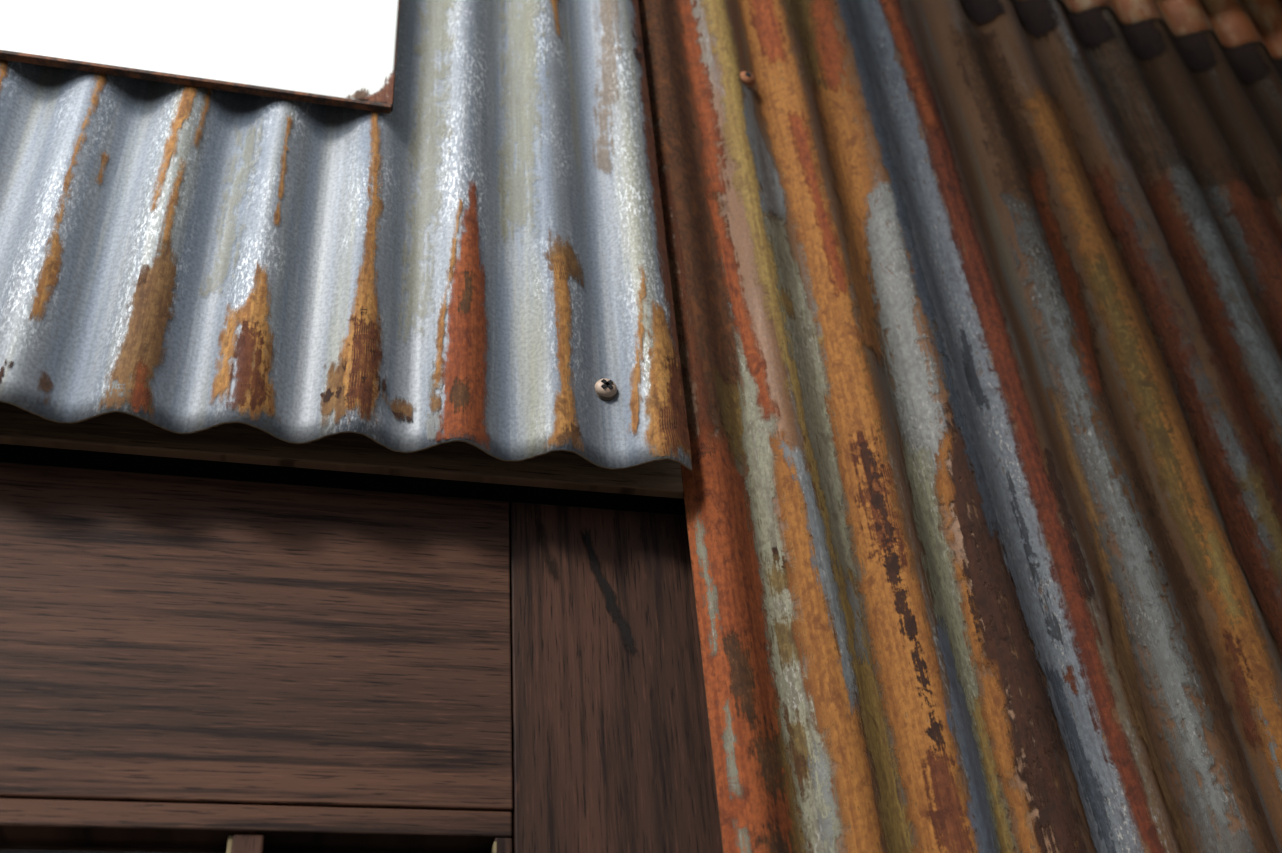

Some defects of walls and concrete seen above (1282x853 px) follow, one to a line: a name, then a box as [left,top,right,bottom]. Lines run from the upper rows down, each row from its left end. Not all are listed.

rust [38,371,53,404]
rust [29,74,107,320]
rust [96,152,109,185]
rust [99,85,213,415]
rust [210,262,275,419]
rust [274,117,293,225]
rust [320,72,394,425]
rust [432,182,490,449]
rust [545,231,584,448]
rust [629,0,884,853]
rust [737,0,980,853]
rust [879,0,1282,853]